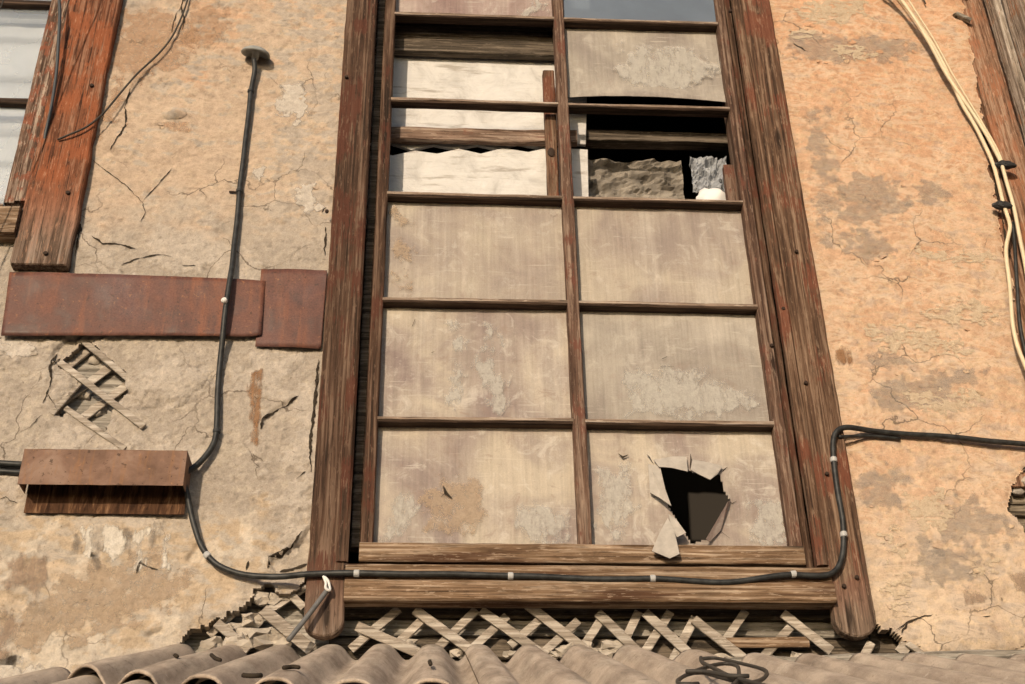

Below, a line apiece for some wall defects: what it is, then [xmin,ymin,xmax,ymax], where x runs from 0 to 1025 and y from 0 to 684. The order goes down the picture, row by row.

crack [92,89,170,220]
crack [75,216,195,266]
rust [249,369,263,444]
spalling [1007,476,1025,533]
spalling [173,578,329,682]